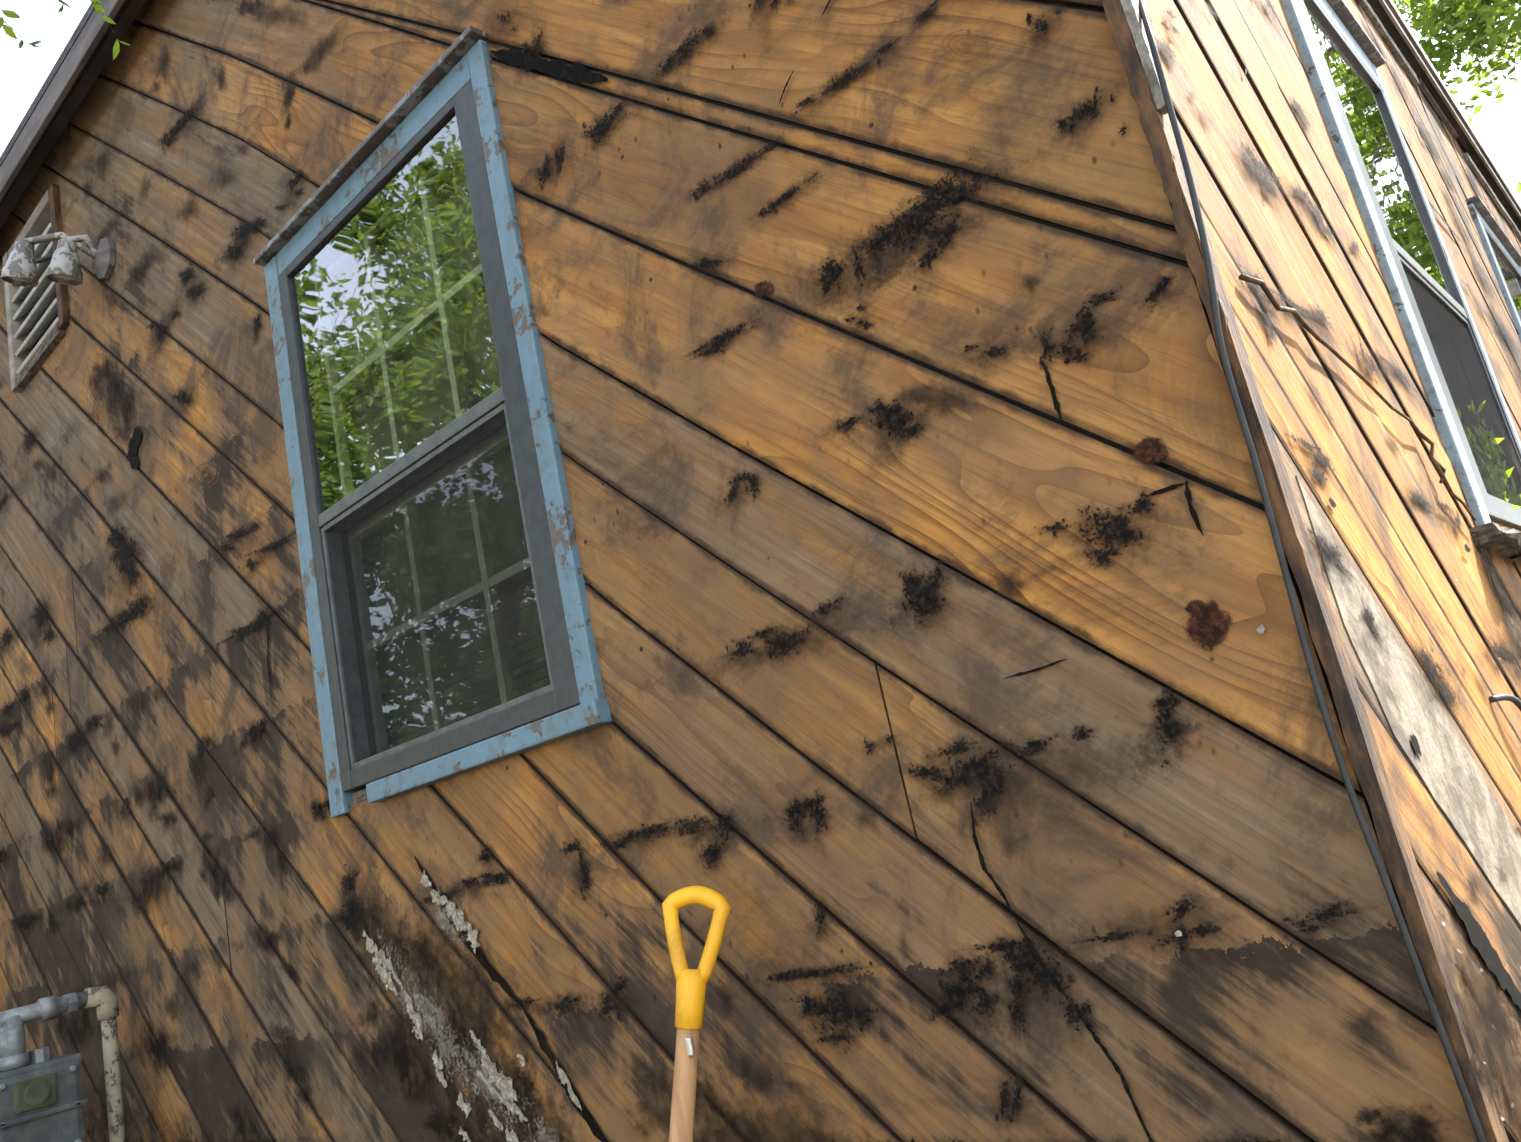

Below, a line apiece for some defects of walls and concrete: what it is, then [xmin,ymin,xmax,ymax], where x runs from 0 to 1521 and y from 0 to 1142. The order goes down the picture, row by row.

crack [1042,361,1062,422]
peeling [363,930,528,1142]
peeling [420,870,480,954]
leakage [357,899,564,1142]
peeling [555,1061,582,1113]
crack [971,802,1154,1142]